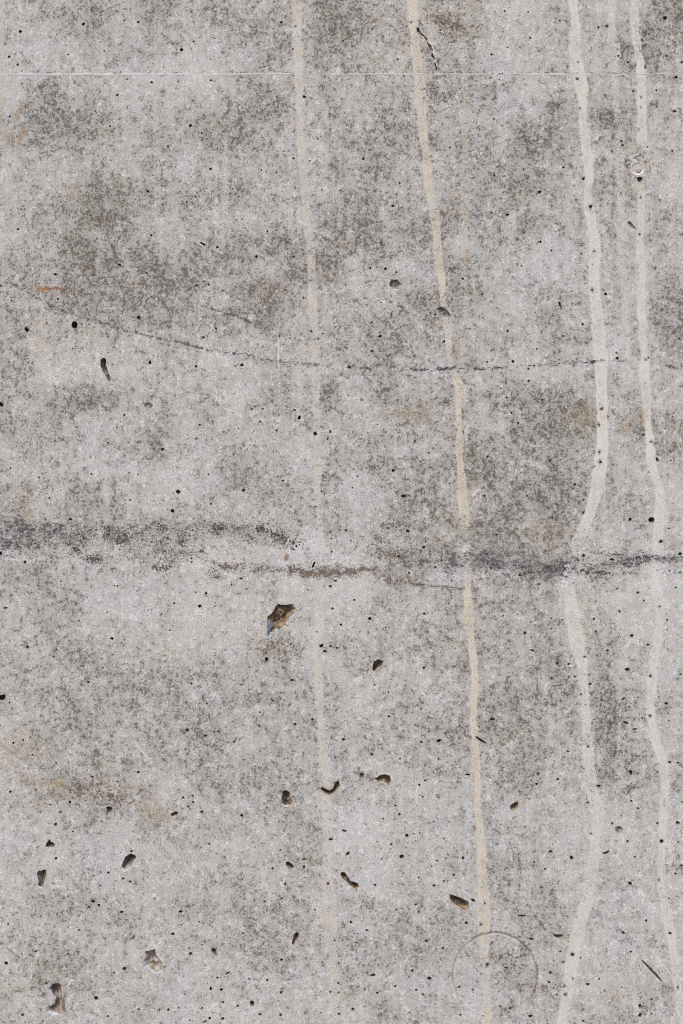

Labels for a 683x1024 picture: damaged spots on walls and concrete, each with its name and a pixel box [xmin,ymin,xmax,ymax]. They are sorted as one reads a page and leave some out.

water stain [0,0,426,790]
water stain [356,0,683,1024]
water stain [320,793,346,1024]